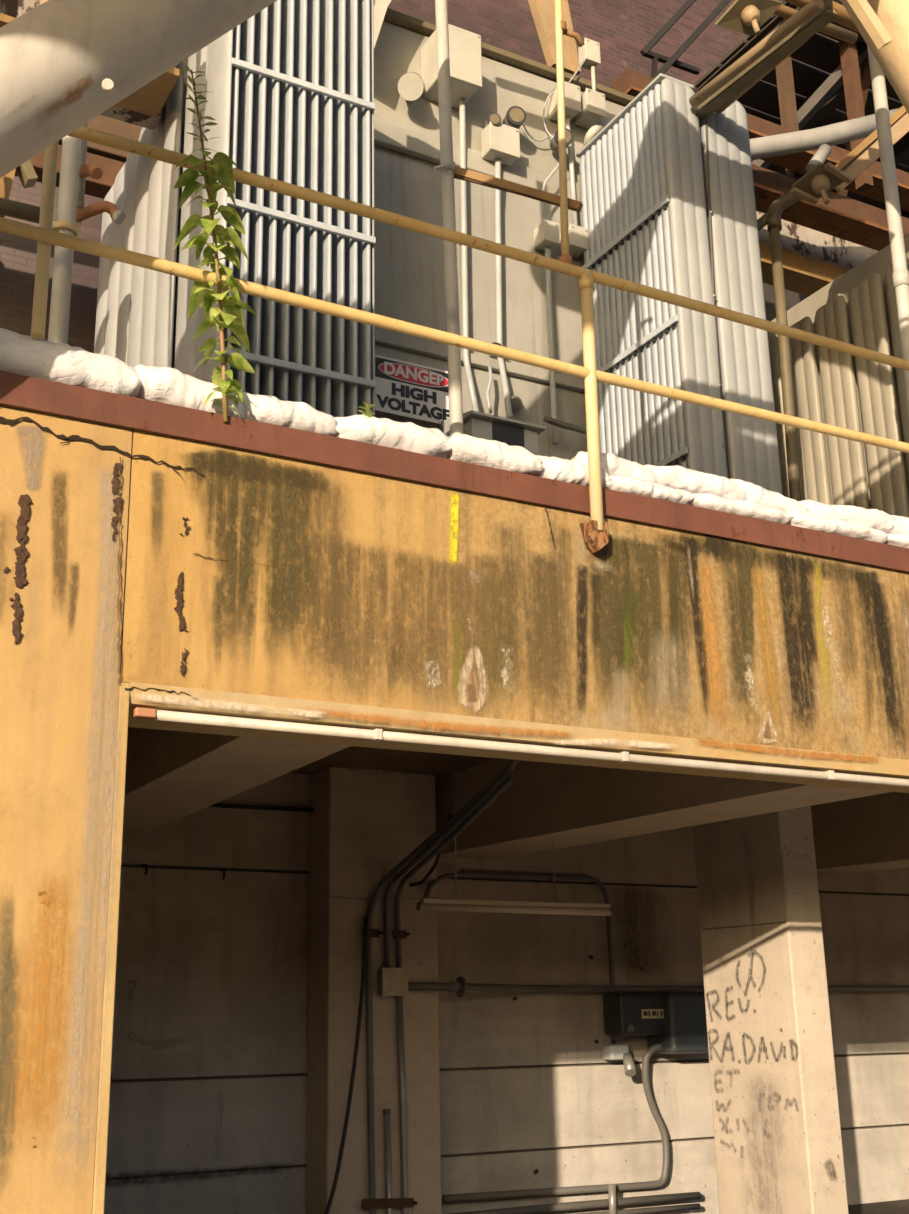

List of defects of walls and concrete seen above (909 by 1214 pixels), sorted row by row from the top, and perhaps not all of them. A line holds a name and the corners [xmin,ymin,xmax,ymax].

spalling [4,426,43,644]
crack [0,416,204,699]
spalling [111,463,123,542]
leakage [152,473,161,528]
spalling [174,571,187,631]
leakage [190,450,516,687]
leakage [577,536,901,735]
leakage [140,694,322,717]
leakage [561,738,671,748]